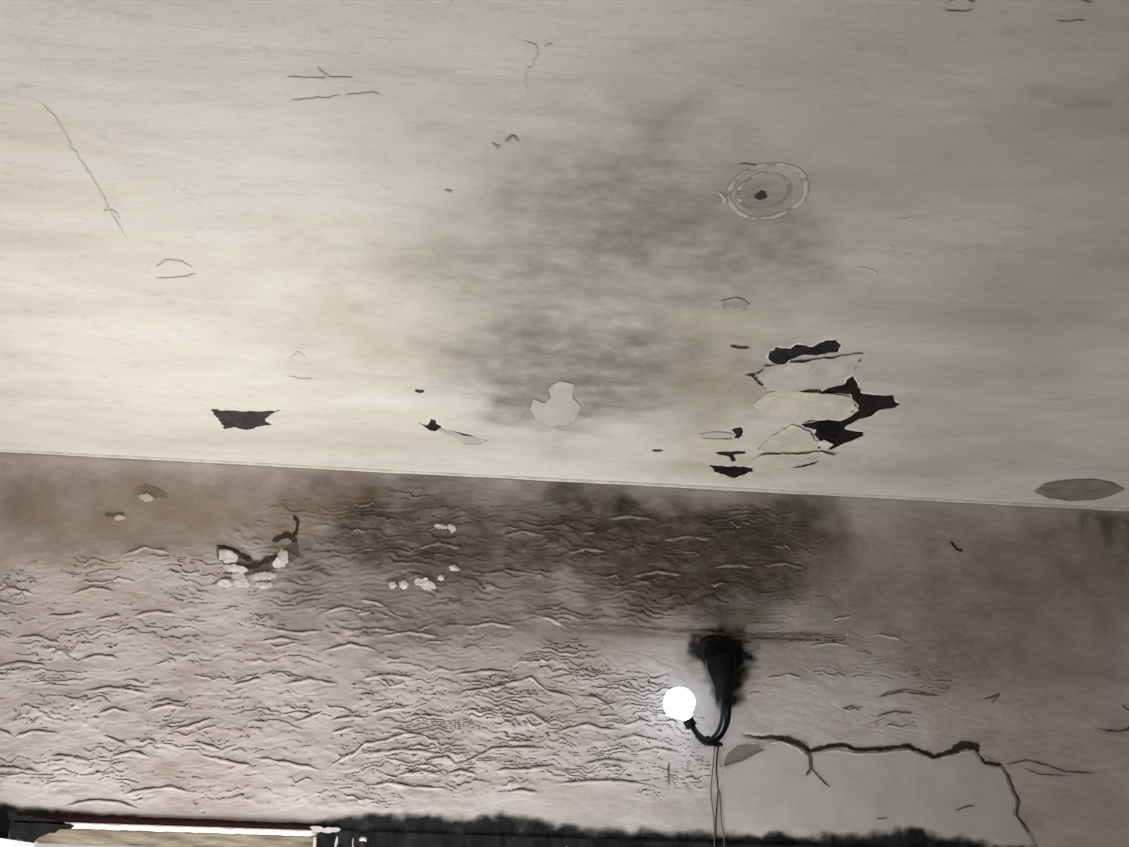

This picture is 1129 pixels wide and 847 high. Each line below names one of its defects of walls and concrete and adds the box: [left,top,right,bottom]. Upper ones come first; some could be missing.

crack [31,99,127,239]
peeling [209,407,281,430]
peeling [699,338,913,478]
damp [96,477,255,539]
flaking render [216,515,300,589]
flaking render [386,565,460,591]
damp [278,482,830,616]
crack [843,690,938,716]
crack [1098,704,1129,732]
crack [749,735,1096,830]
damp [371,817,390,847]
damp [908,829,925,847]